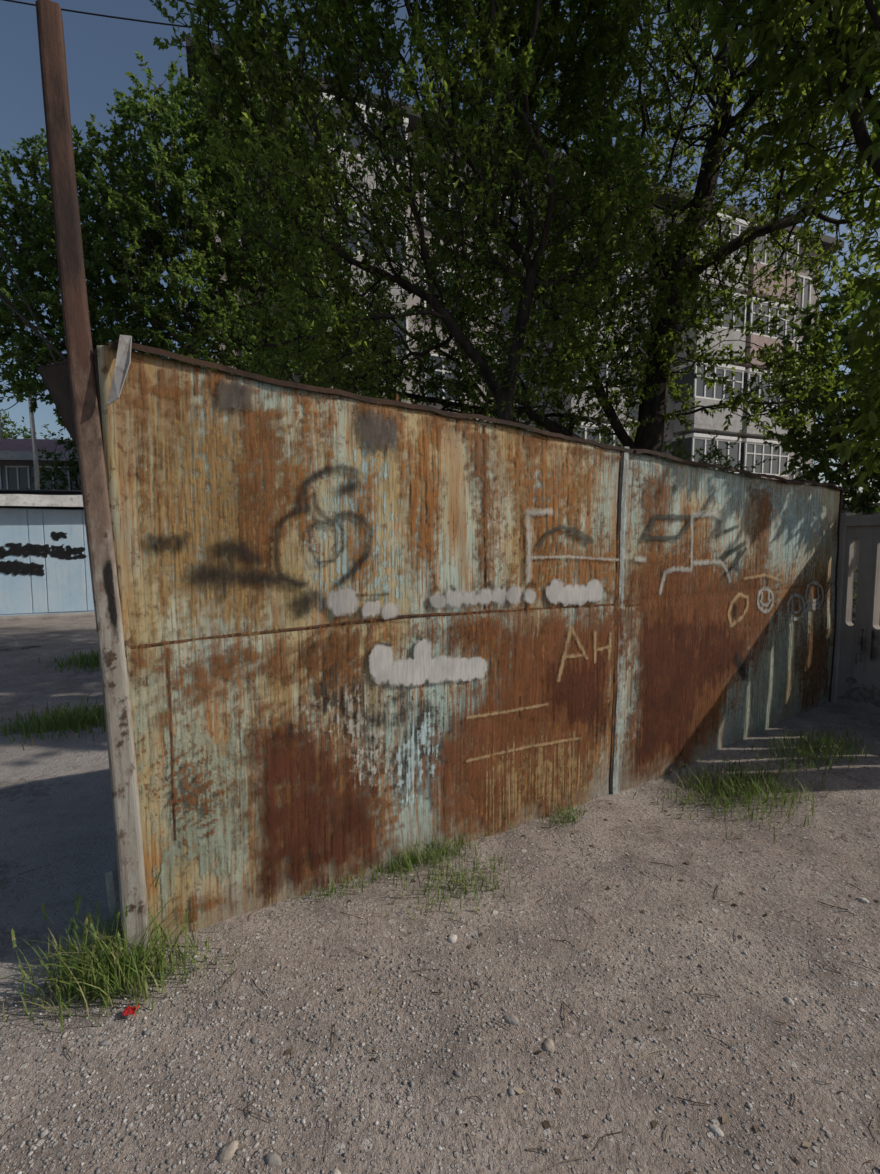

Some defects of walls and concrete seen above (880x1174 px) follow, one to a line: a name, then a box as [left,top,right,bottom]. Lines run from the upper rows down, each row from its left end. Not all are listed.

peeling [318,681,402,790]
rust [120,357,836,936]